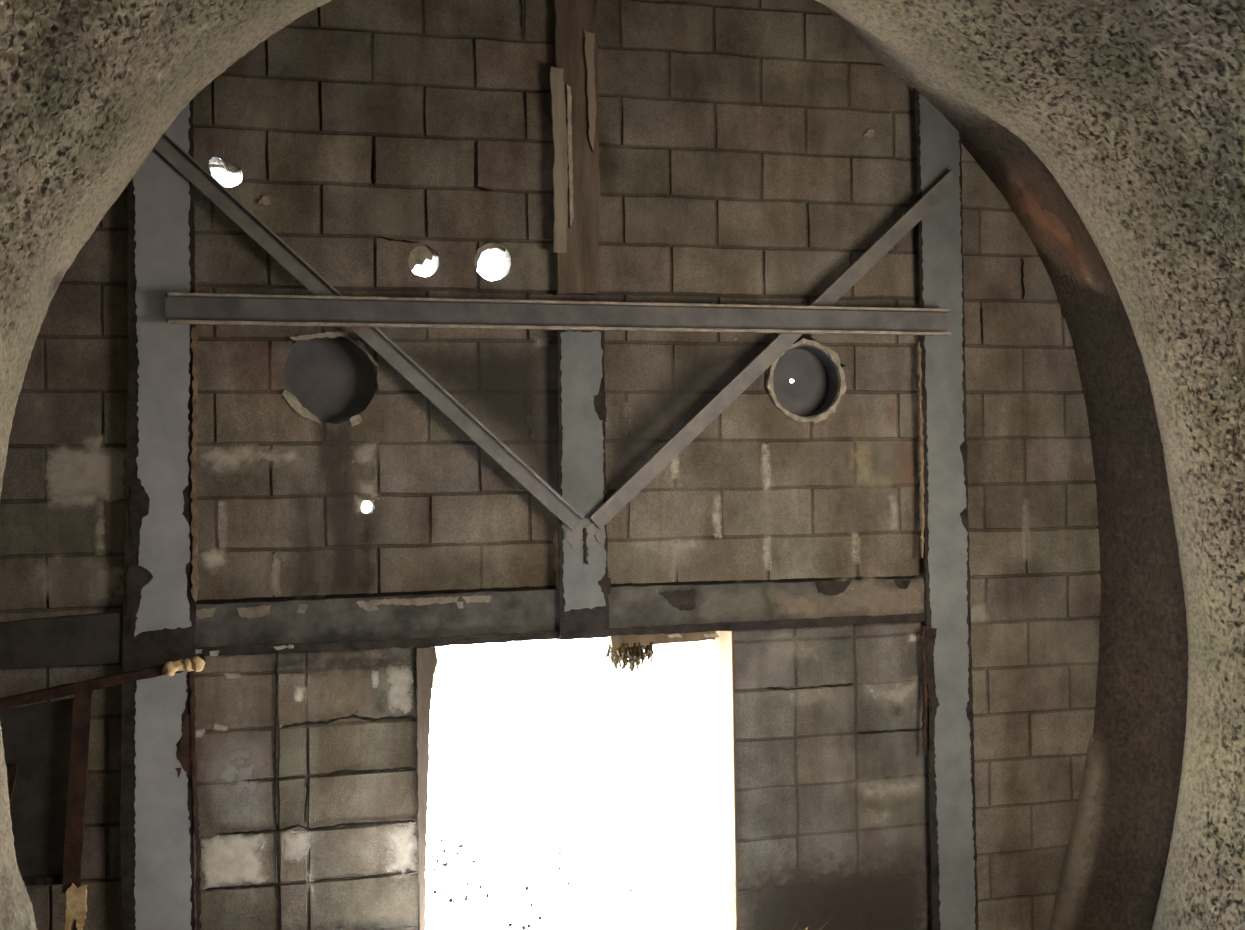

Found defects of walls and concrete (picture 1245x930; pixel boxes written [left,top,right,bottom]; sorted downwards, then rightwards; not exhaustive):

corrosion [1010,175,1095,282]
peeling [126,485,153,637]
peeling [583,528,606,565]
peeling [776,579,921,617]
peeling [175,714,197,778]
leakage [202,834,264,888]
leakage [285,834,309,857]
leakage [390,825,417,869]